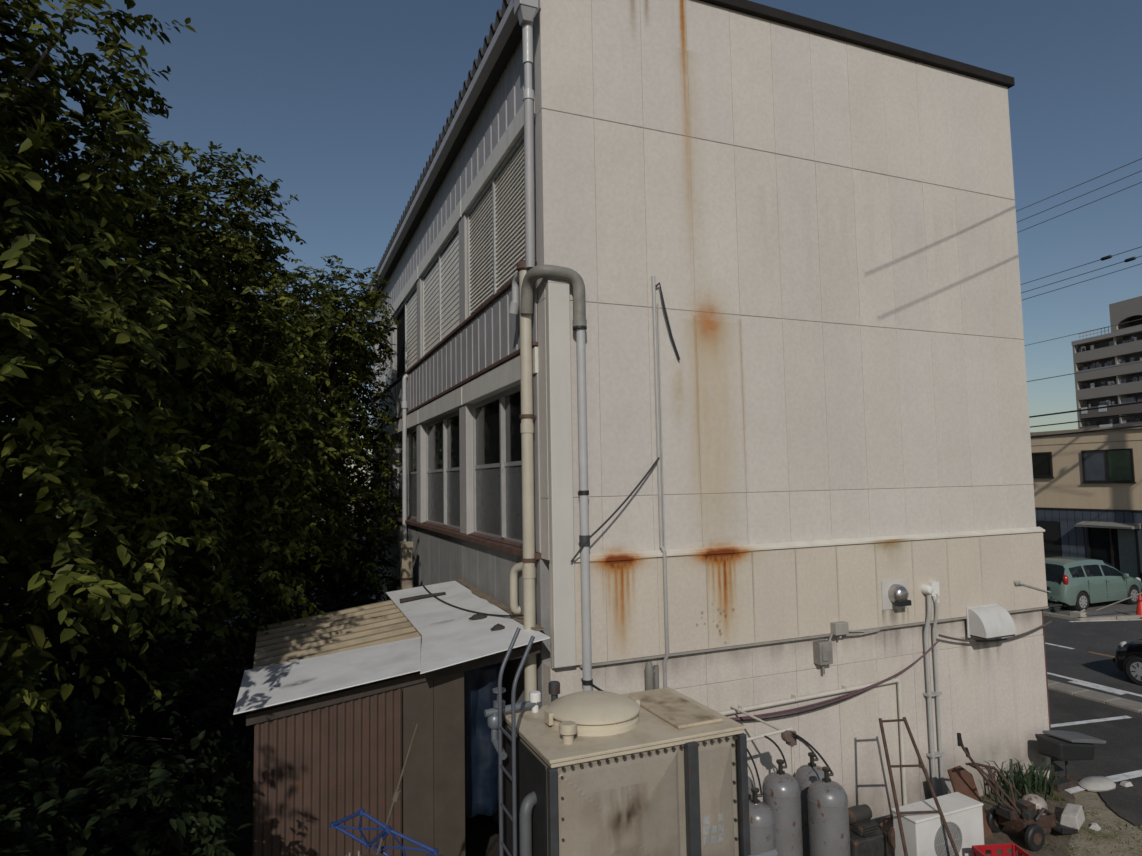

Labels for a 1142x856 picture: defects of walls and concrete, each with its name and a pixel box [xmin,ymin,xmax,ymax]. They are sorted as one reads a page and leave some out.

corrosion [598,553,639,617]
corrosion [697,547,748,607]